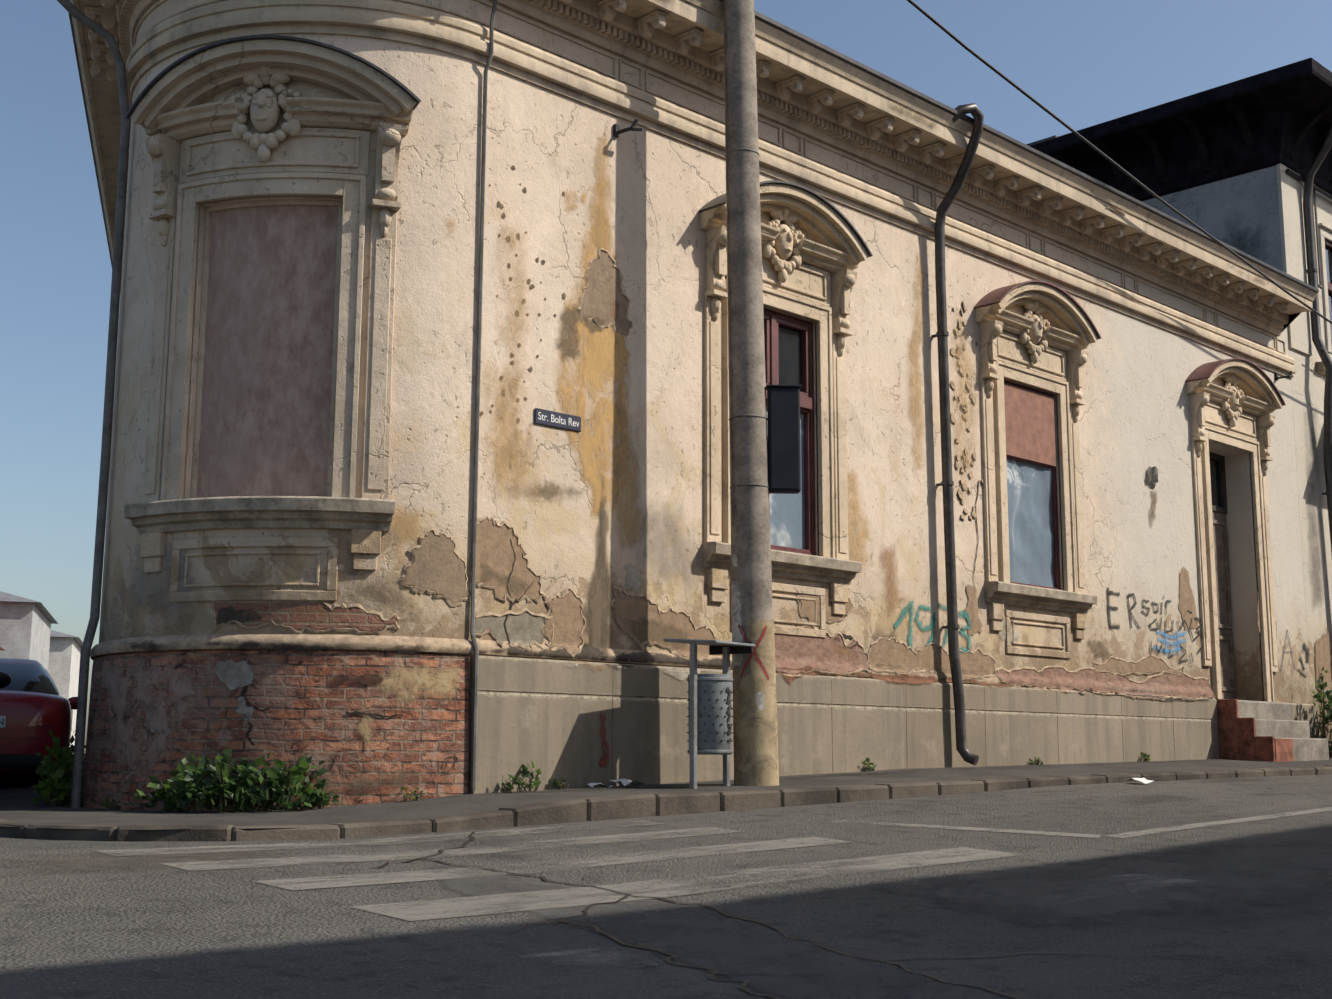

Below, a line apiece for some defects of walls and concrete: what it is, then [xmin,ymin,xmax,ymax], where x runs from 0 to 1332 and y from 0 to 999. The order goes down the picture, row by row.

flaking render [499,232,556,327]
spalling [563,248,633,335]
flaking render [480,339,542,424]
water stain [557,141,651,650]
water stain [911,313,921,437]
spalling [399,515,586,658]
spalling [611,586,717,661]
spalling [774,583,1214,701]